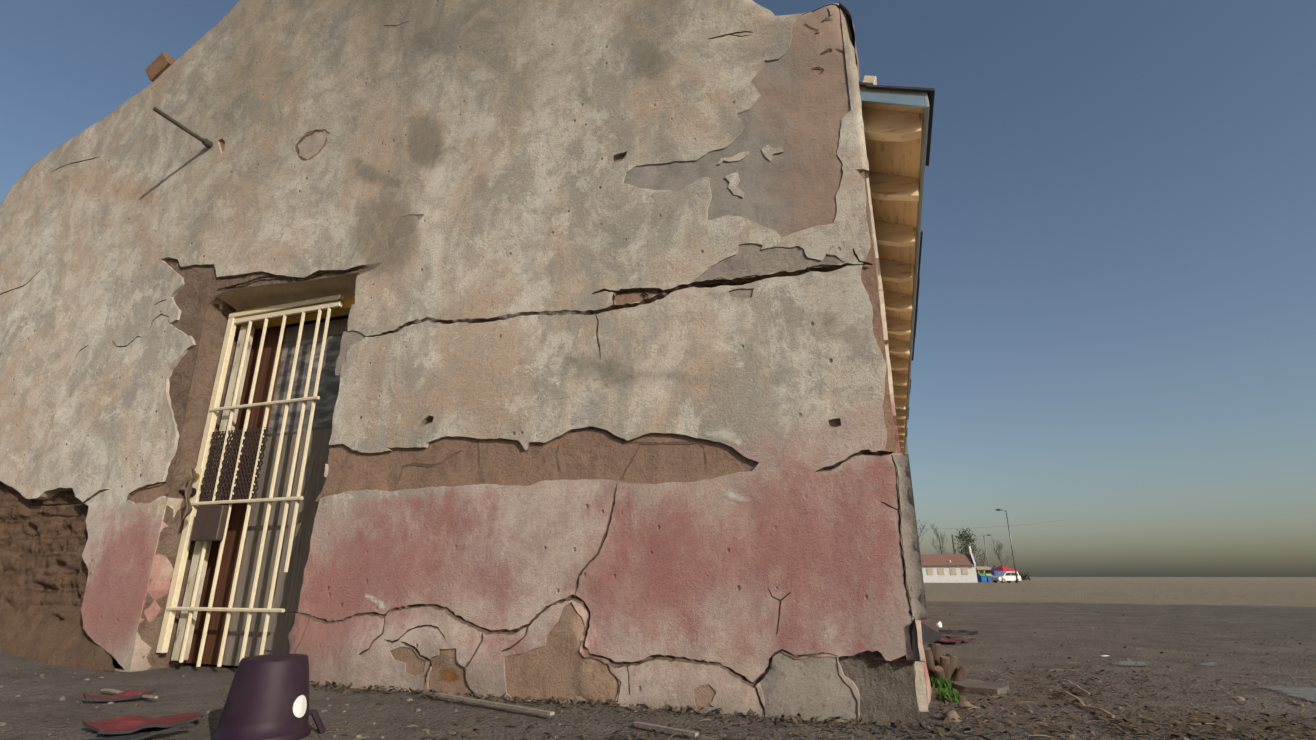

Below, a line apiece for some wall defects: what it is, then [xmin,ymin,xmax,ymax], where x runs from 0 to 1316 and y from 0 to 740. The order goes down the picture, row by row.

peeling [614,5,853,299]
peeling [335,331,365,376]
crack [365,249,873,359]
spalling [859,171,897,453]
spalling [315,427,758,501]
crack [283,482,838,717]
crack [816,449,915,650]
spalling [839,621,920,724]